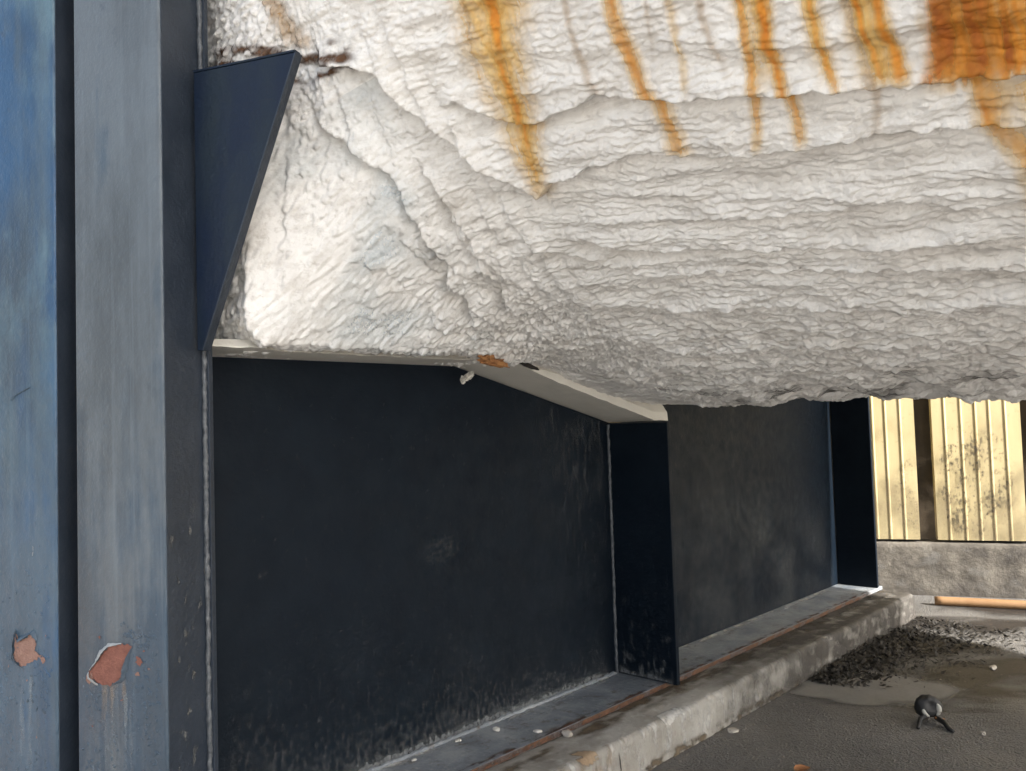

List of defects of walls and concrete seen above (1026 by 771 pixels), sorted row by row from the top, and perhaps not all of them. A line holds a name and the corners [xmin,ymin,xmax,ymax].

corrosion [459,0,540,177]
corrosion [605,0,682,154]
corrosion [736,0,802,141]
corrosion [802,0,837,90]
corrosion [850,0,907,83]
corrosion [927,0,1026,165]
mould [941,436,1013,530]
peeling [8,630,46,668]
peeling [86,636,149,686]